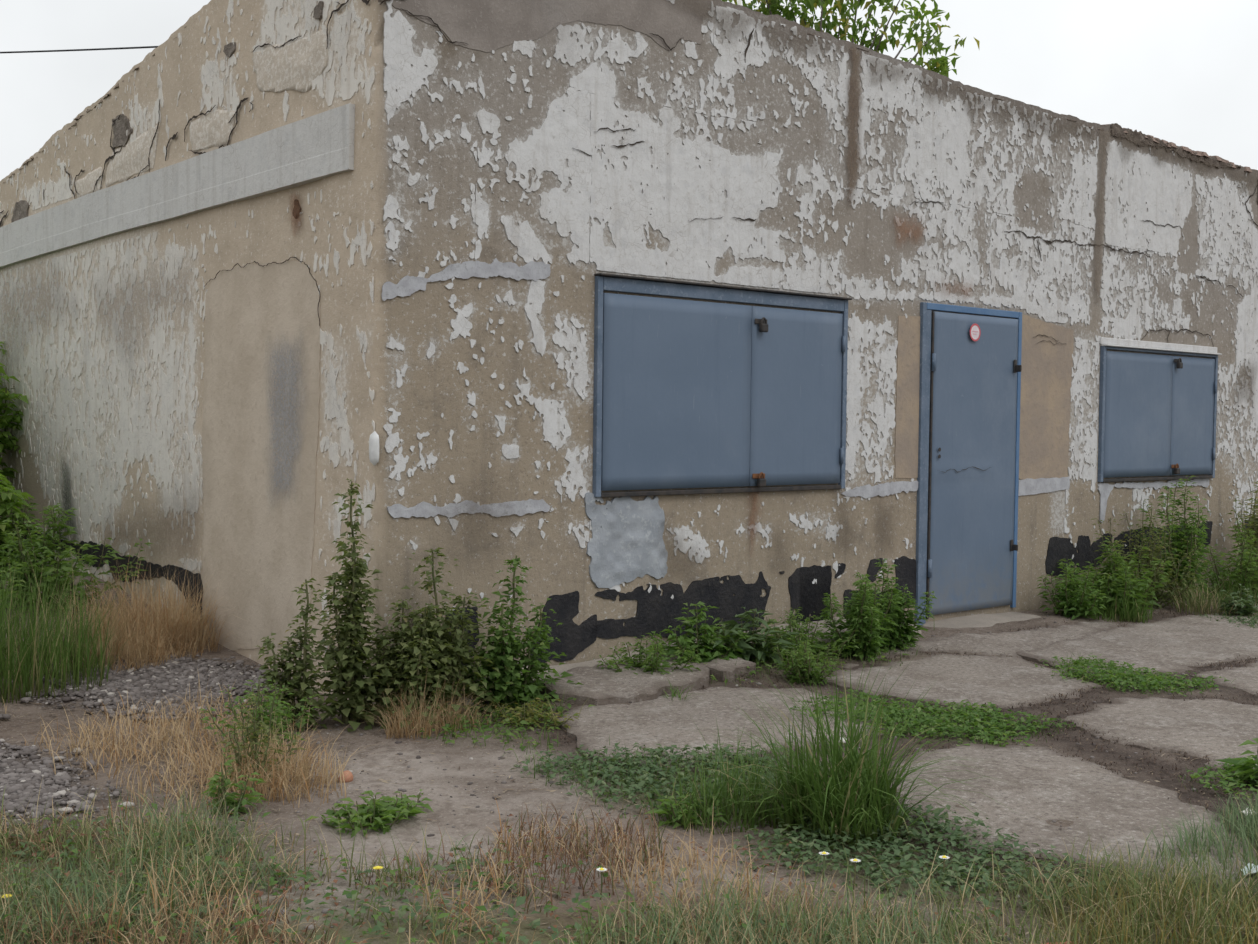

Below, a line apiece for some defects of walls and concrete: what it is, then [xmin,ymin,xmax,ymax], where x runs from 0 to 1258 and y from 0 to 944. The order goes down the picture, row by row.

crack [253,0,467,52]
peeling [0,128,96,223]
crack [1004,220,1181,261]
crack [204,257,321,326]
peeling [96,0,1258,623]
peeling [0,224,218,608]